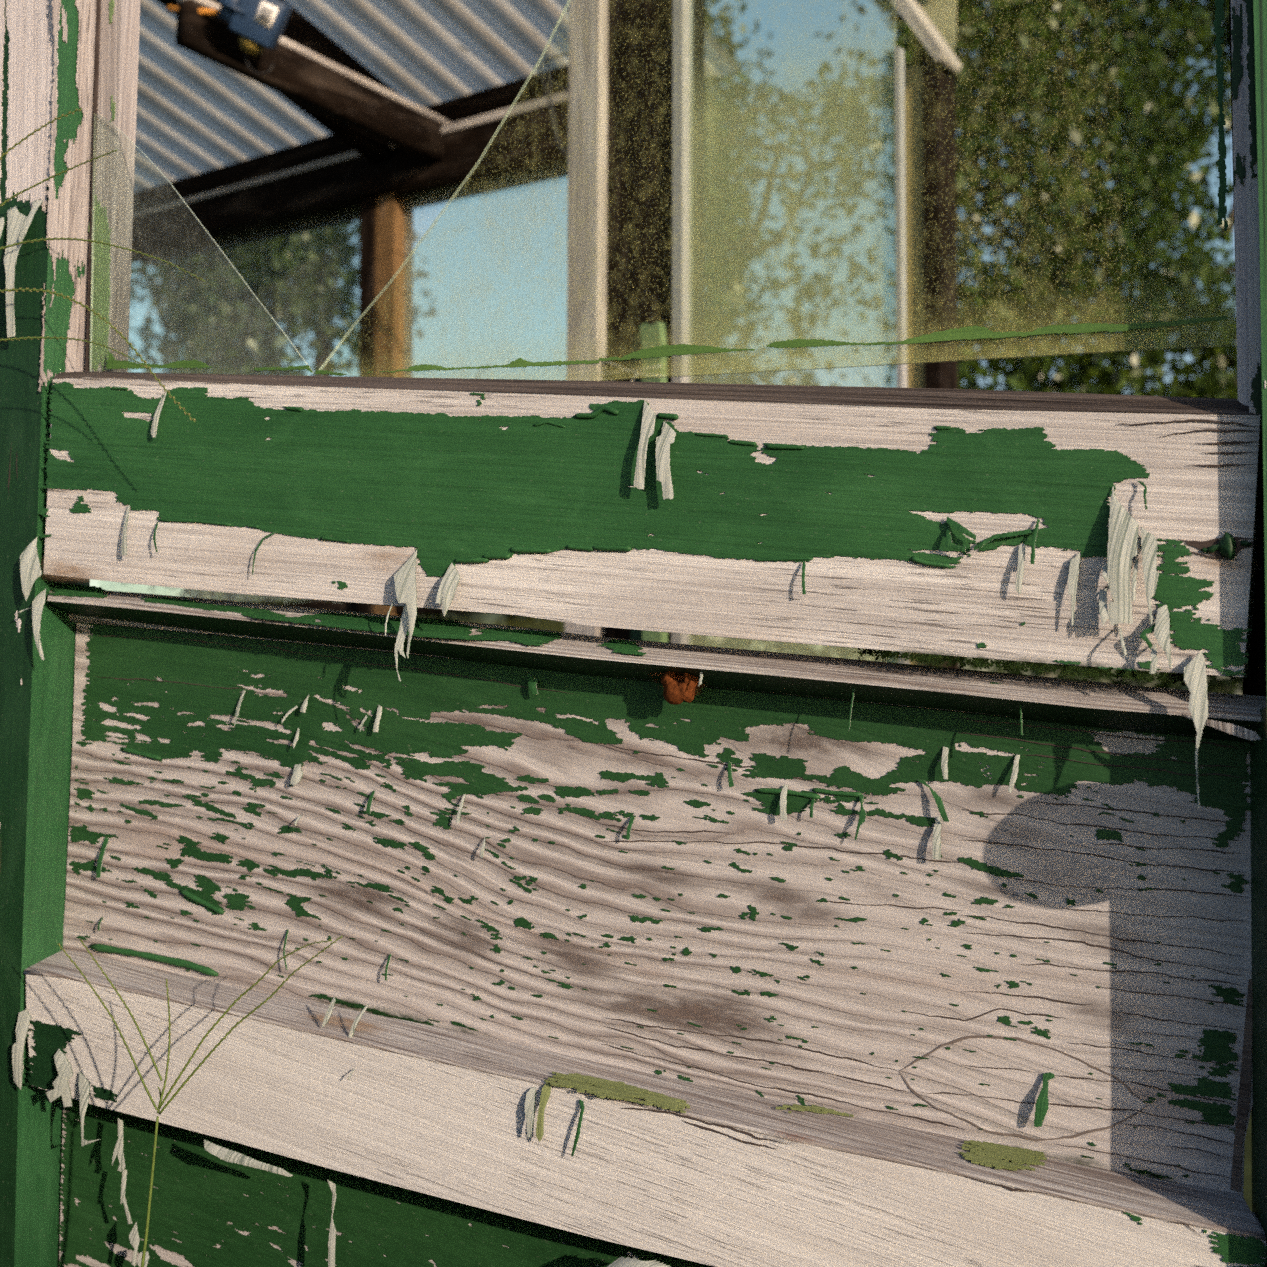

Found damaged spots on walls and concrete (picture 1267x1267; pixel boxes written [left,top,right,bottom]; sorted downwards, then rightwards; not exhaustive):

peeling [1250,352,1266,425]
peeling [0,0,1261,953]
peeling [76,921,219,976]
peeling [514,893,683,990]
peeling [731,966,780,997]
peeling [958,944,1032,995]
peeling [309,994,494,1031]
peeling [987,1014,1053,1041]
peeling [1143,1028,1239,1134]
peeling [12,1009,714,1267]
peeling [958,1128,1047,1171]
peeling [1203,1229,1267,1267]